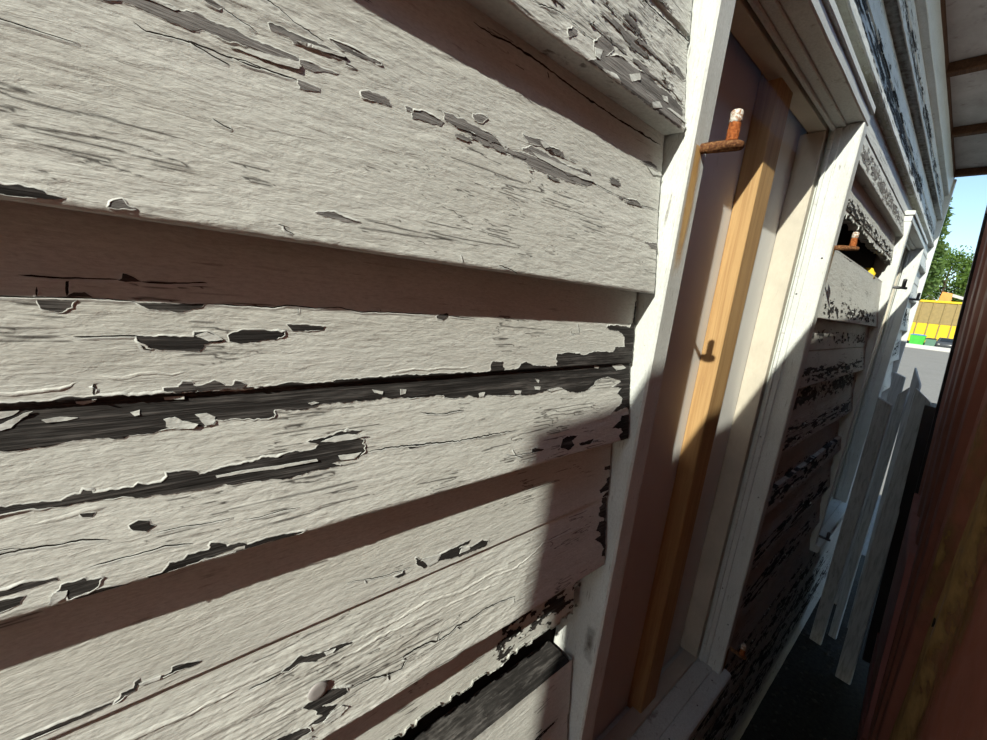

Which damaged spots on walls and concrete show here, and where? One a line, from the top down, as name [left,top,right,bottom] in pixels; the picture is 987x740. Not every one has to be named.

peeling [0,181,65,202]
peeling [99,0,384,93]
peeling [404,105,596,187]
crack [473,22,660,146]
peeling [566,0,687,129]
peeling [855,0,943,241]
peeling [0,300,637,453]
peeling [0,428,367,519]
peeling [0,575,134,614]
peeling [127,519,156,532]
peeling [146,529,308,578]
peeling [493,582,581,667]